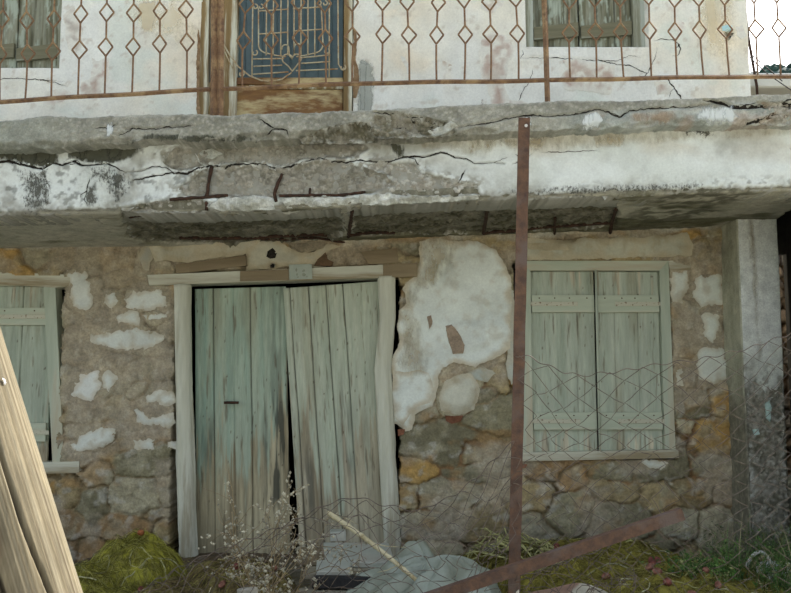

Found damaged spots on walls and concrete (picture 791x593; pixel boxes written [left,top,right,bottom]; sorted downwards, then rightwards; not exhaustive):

crack [374,38,791,130]
crack [95,125,192,135]
damp [144,134,257,143]
crack [259,119,289,137]
damp [0,152,58,214]
damp [68,141,138,207]
crack [0,151,515,202]
peeling [121,111,516,431]
peeling [90,289,169,351]
peeling [669,270,726,384]
peeling [71,370,118,401]
peeling [70,427,116,451]